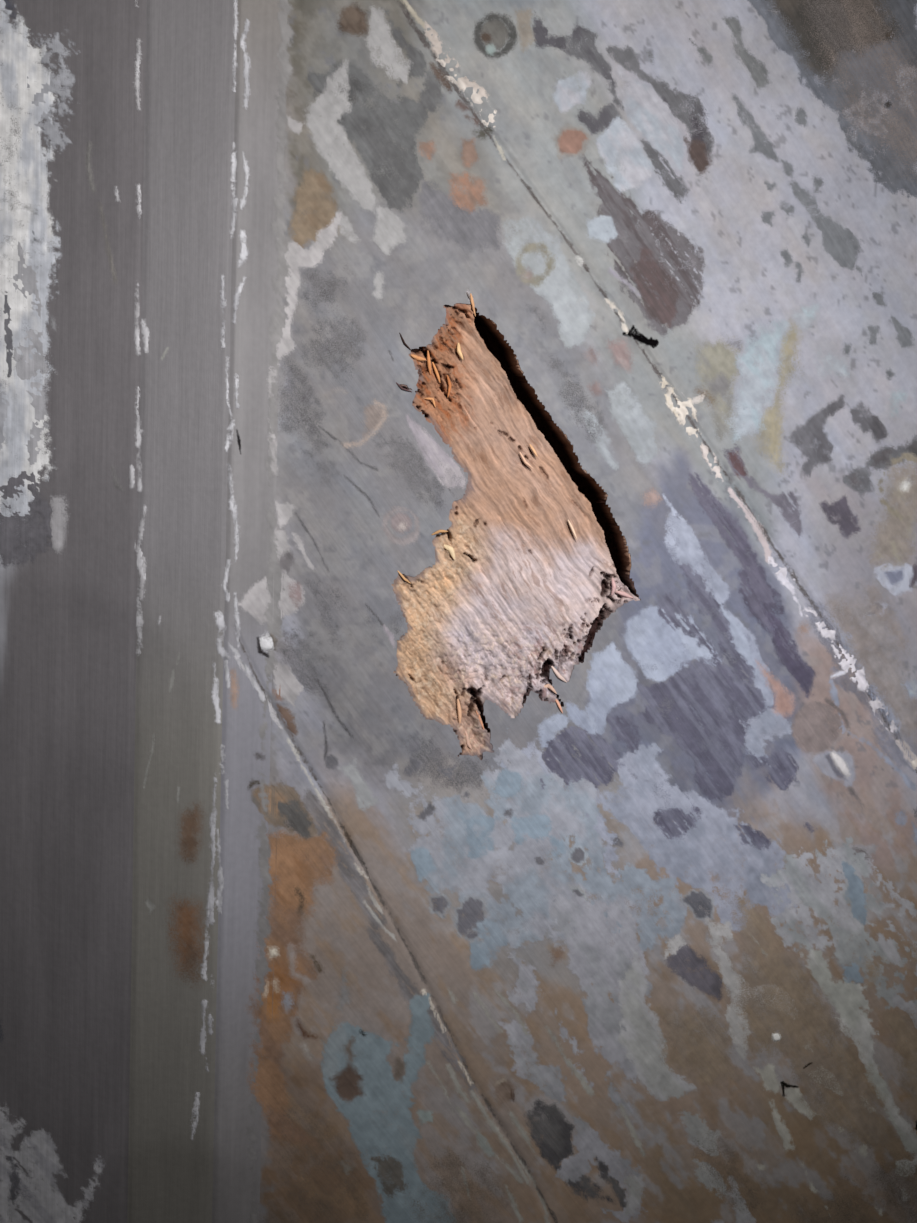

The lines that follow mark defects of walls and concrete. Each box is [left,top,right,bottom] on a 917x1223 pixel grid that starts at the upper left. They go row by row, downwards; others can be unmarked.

peeling [0,0,121,571]
spalling [132,284,150,356]
peeling [531,17,715,204]
peeling [581,155,706,339]
crack [396,0,917,773]
peeling [721,14,769,91]
peeling [730,93,864,275]
peeling [747,0,917,199]
spalling [110,387,162,653]
peeling [211,0,505,1081]
spalling [302,292,917,1223]
peeling [0,1104,105,1223]